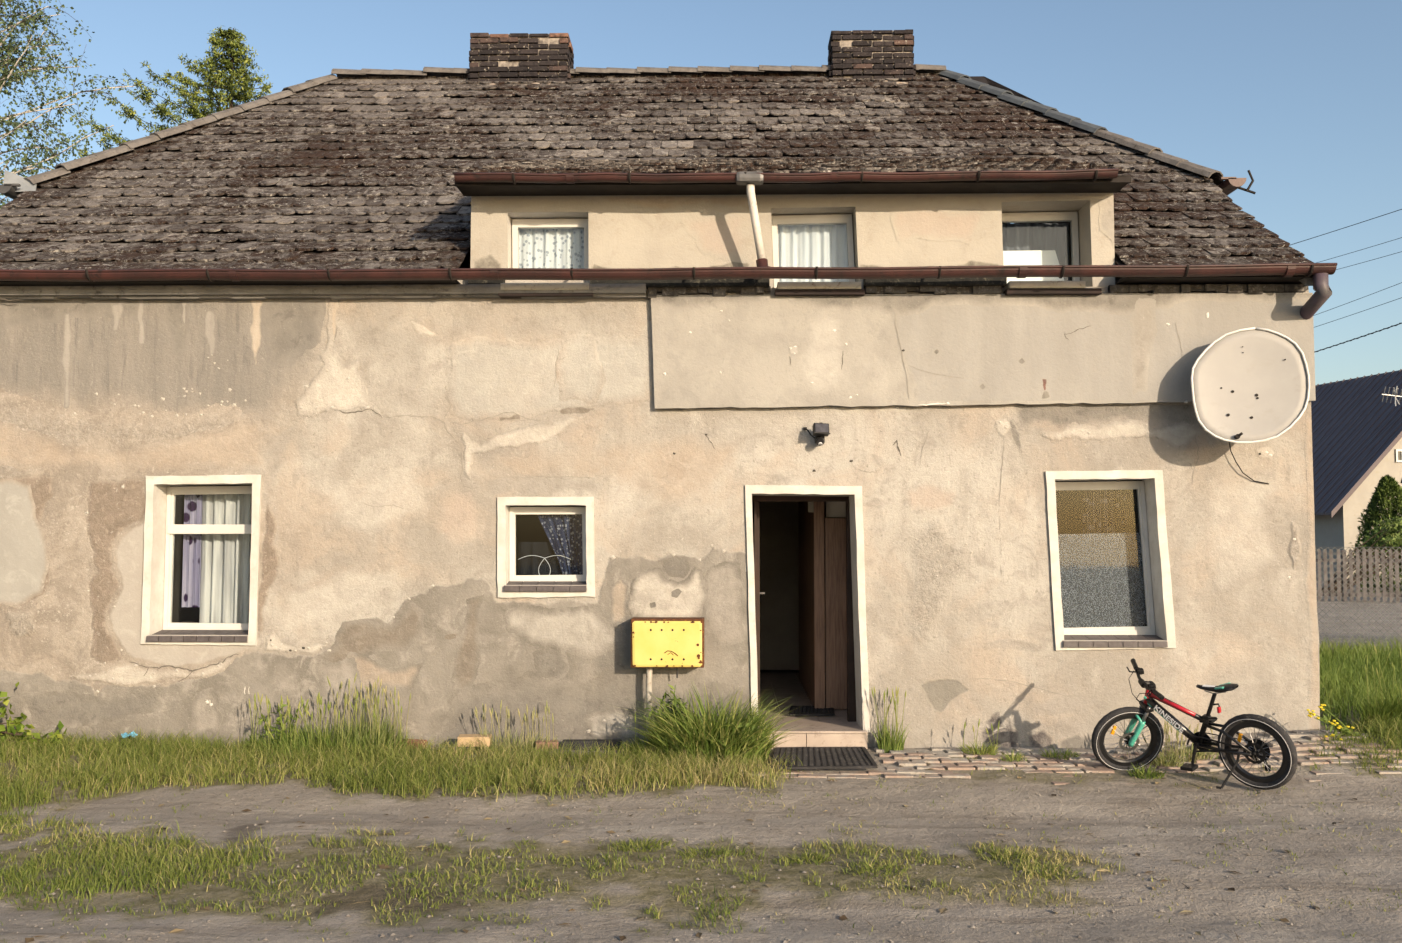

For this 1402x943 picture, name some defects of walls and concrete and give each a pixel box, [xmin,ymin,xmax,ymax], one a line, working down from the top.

peeling [294,301,381,420]
flaking render [0,388,250,450]
peeling [460,415,588,481]
peeling [0,465,56,525]
peeling [67,476,237,687]
peeling [626,566,709,618]
peeling [584,709,639,739]